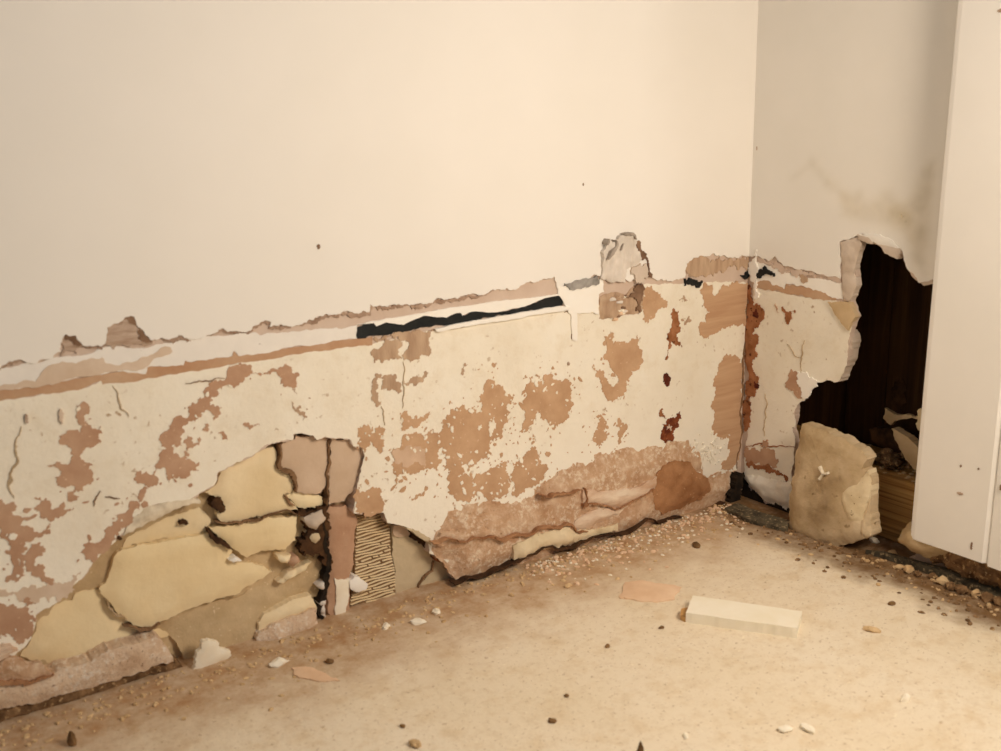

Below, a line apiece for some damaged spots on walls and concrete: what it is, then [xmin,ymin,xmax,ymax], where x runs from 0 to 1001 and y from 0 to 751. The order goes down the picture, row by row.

spalling [642,234,903,383]
peeling [785,369,820,400]
flaking render [0,329,792,722]
spalling [860,472,882,539]